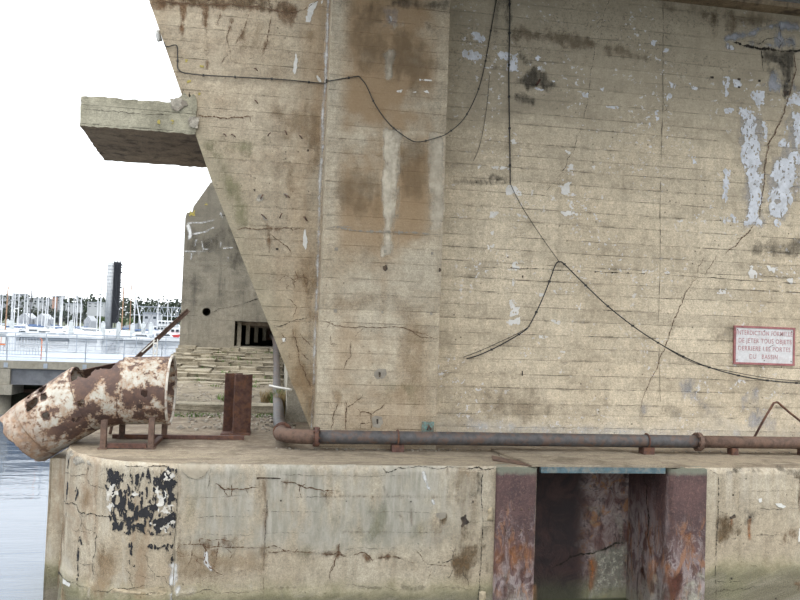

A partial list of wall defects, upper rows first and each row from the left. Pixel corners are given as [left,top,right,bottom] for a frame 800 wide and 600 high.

rust [666,565,682,600]